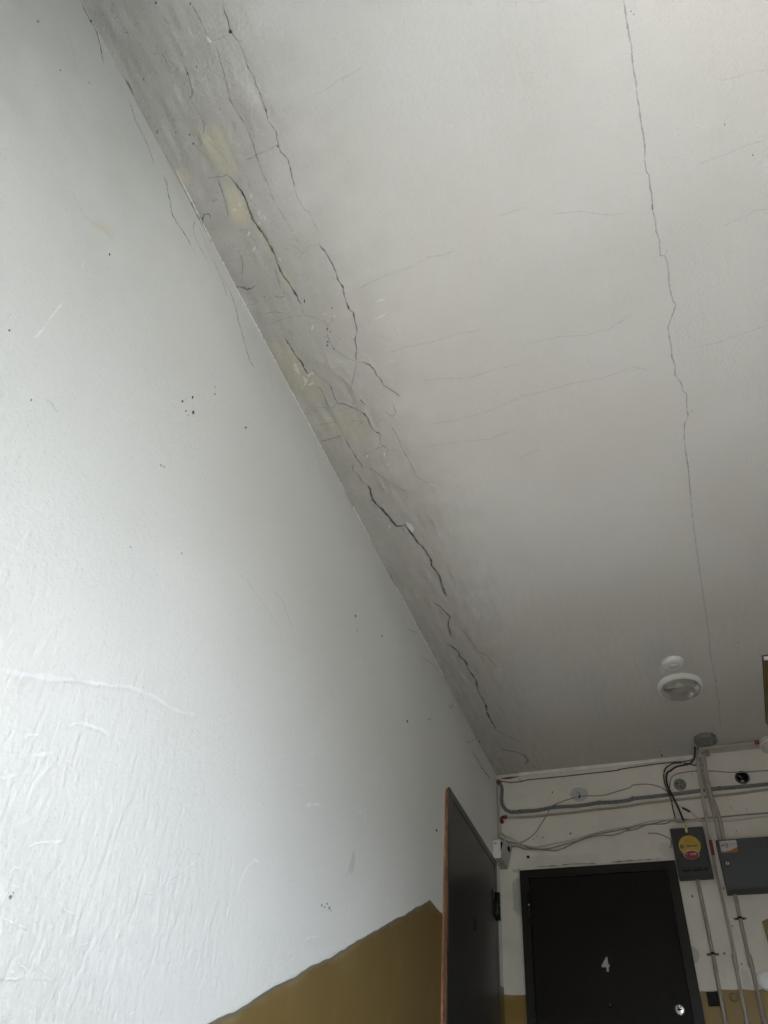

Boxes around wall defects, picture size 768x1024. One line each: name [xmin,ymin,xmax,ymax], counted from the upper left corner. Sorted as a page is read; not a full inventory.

crack [230,66,301,304]
crack [321,246,399,396]
crack [368,486,528,779]